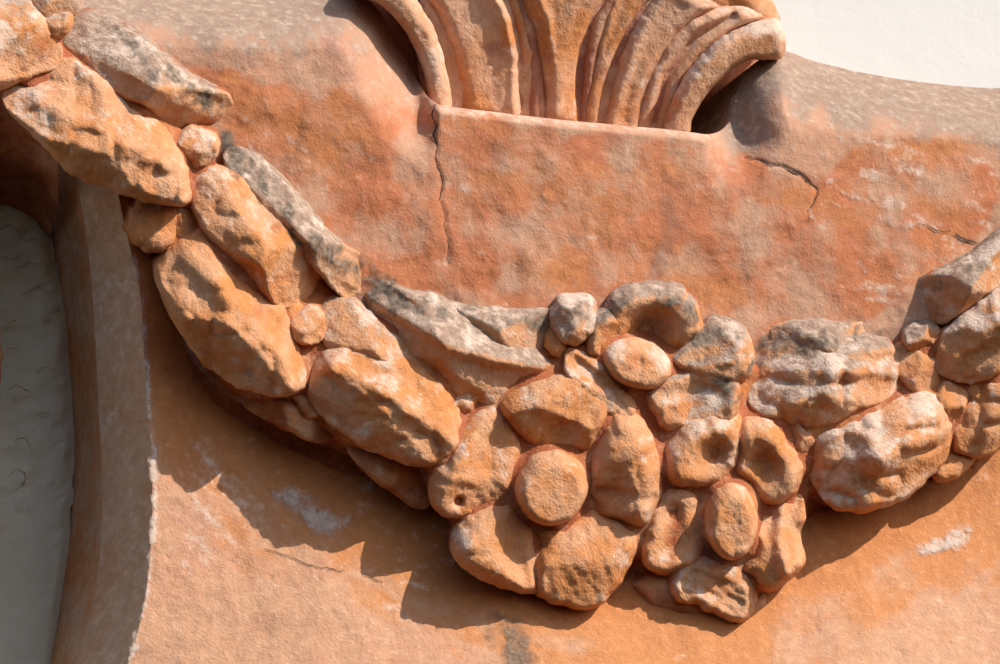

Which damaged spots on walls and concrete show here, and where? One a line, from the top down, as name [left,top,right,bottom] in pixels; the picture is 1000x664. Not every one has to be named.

crack [431,105,450,264]
crack [745,157,818,211]
crack [918,223,977,243]
water stain [504,626,532,664]